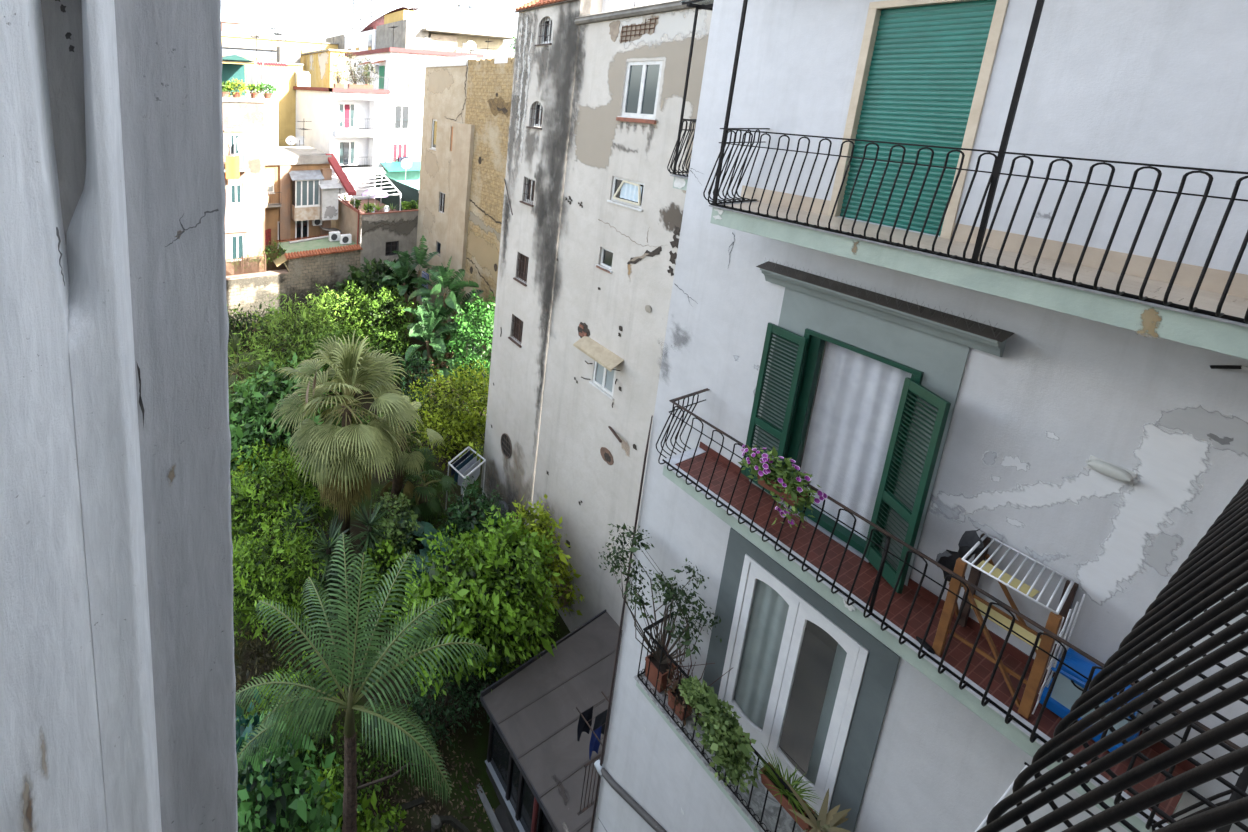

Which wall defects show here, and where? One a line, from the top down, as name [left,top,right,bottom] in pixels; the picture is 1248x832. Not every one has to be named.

flaking render [609,15,659,43]
crack [165,209,219,247]
damp [508,0,590,404]
rust [22,779,34,832]